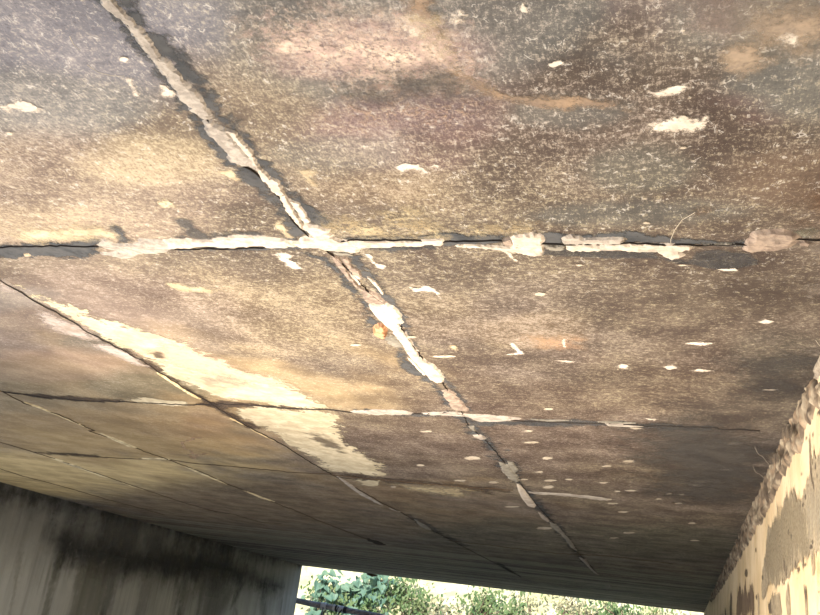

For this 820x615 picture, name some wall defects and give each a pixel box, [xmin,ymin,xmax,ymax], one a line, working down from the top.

crack [0,0,747,415]
leakage [0,482,279,592]
peeling [1,282,387,486]
crack [0,280,760,546]
peeling [397,484,474,497]
crack [517,482,608,576]
peeling [709,356,820,615]